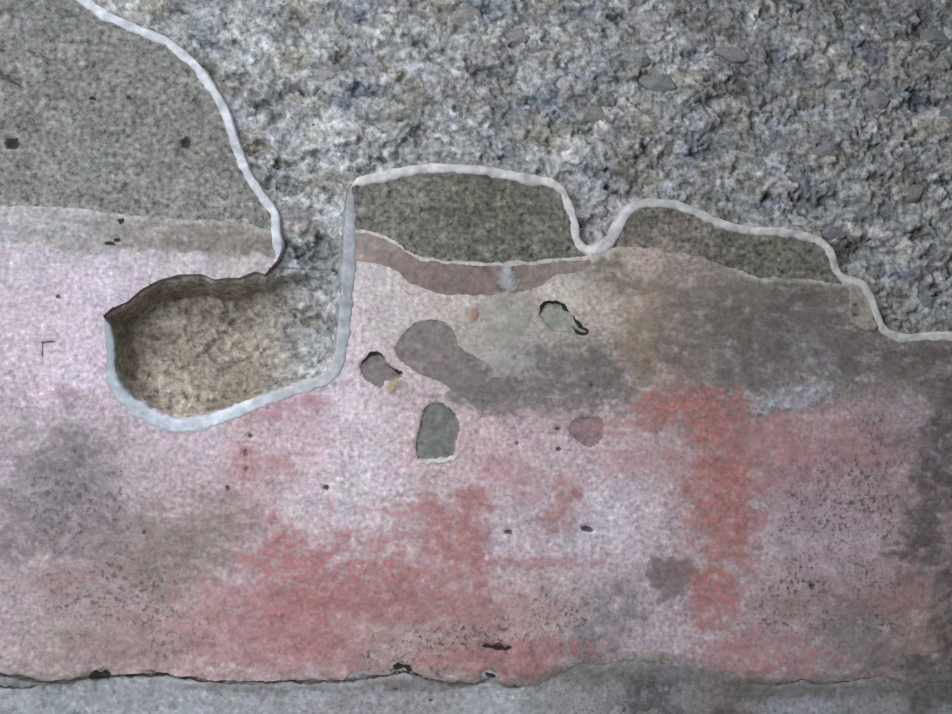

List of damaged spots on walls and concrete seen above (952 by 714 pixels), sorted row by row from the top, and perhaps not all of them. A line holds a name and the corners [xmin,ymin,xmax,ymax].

spalling [4,138,20,149]
spalling [93,0,952,335]
peeling [361,319,515,406]
water stain [653,281,857,414]
peeling [416,403,460,465]
water stain [747,351,952,714]
crack [0,669,472,689]
crack [730,675,949,686]